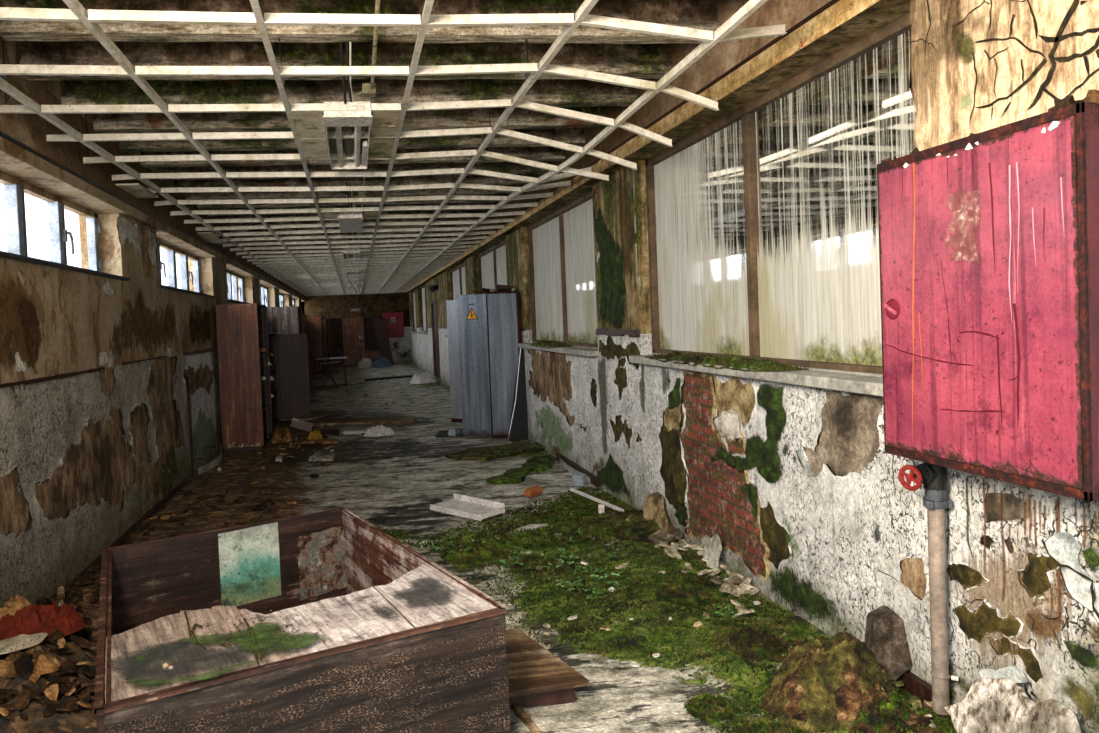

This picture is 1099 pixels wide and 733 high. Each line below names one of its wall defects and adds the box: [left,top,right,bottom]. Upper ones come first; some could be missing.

crack [911,0,1099,125]
flaking render [0,341,214,540]
flaking render [525,349,587,433]
flaking render [590,376,599,410]
flaking render [598,336,643,453]
flaking render [659,371,792,581]
flaking render [796,388,884,481]
rust [982,478,1010,601]
rust [1018,489,1060,548]
rust [1050,562,1062,621]